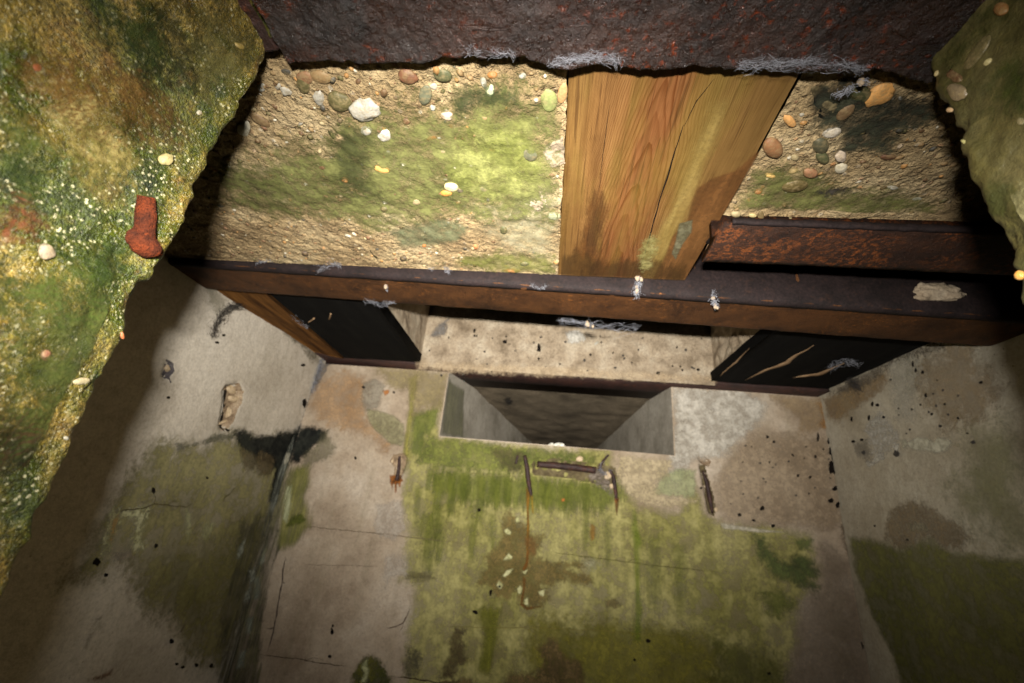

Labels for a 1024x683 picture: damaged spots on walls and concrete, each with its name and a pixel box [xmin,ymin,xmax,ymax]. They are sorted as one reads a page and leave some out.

crack [641,79,714,264]
spalling [218,383,244,431]
leakage [100,506,149,559]
corrosion [520,489,541,610]
leakage [177,344,996,683]